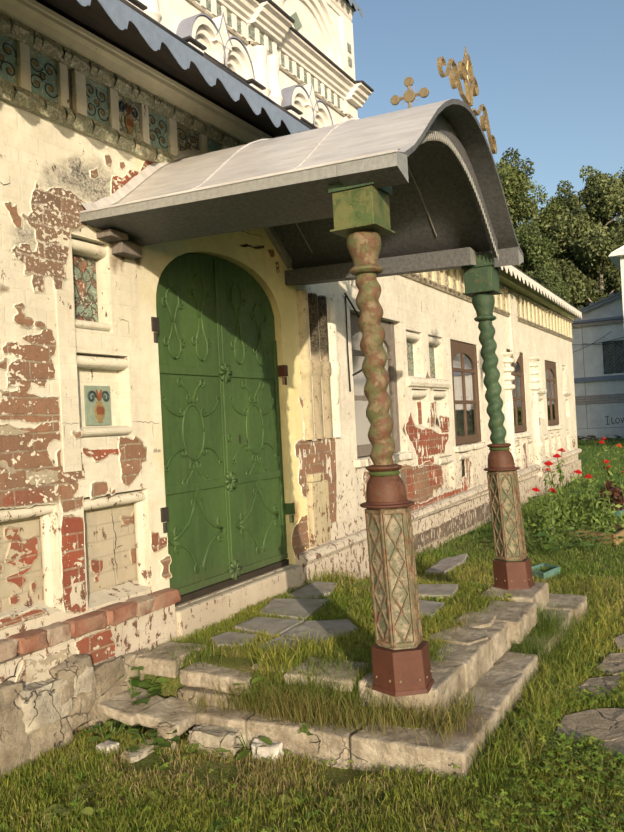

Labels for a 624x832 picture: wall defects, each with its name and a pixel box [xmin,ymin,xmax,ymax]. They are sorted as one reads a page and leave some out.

peeling [3,180,97,295]
flaking render [0,302,148,614]
flaking render [294,420,337,524]
flaking render [362,470,370,509]
flaking render [399,370,471,511]
peeling [0,526,47,630]
flaking render [14,626,116,697]